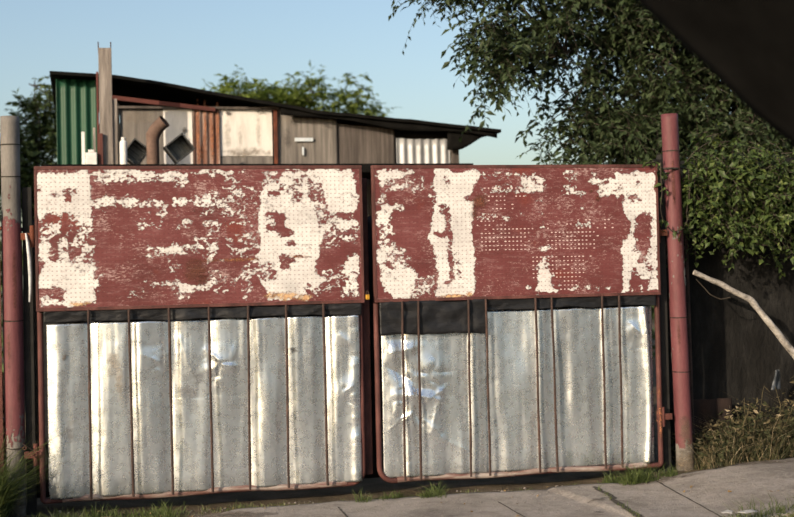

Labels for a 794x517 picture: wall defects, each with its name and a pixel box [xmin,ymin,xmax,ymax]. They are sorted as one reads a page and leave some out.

peeling [37,169,360,308]
peeling [375,168,614,299]
peeling [588,170,658,293]
crack [593,486,643,517]